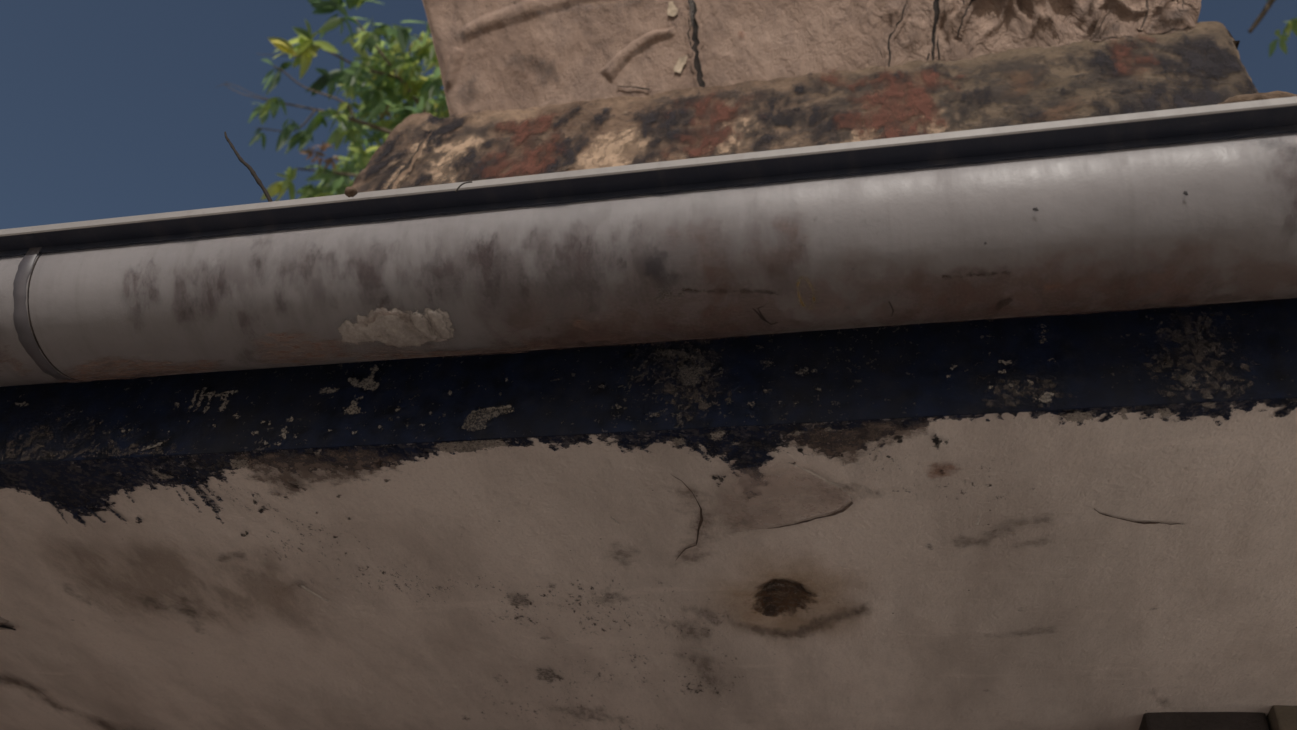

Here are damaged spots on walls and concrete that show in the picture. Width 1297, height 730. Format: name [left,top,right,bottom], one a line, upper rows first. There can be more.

crack [684,0,709,87]
crack [884,0,984,67]
leakage [632,36,1257,165]
leakage [359,106,610,192]
peeling [1,412,175,480]
peeling [174,387,240,427]
peeling [251,417,297,445]
peeling [318,365,379,414]
peeling [434,405,514,453]
peeling [634,338,799,446]
peeling [986,360,1059,407]
peeling [1140,306,1253,419]